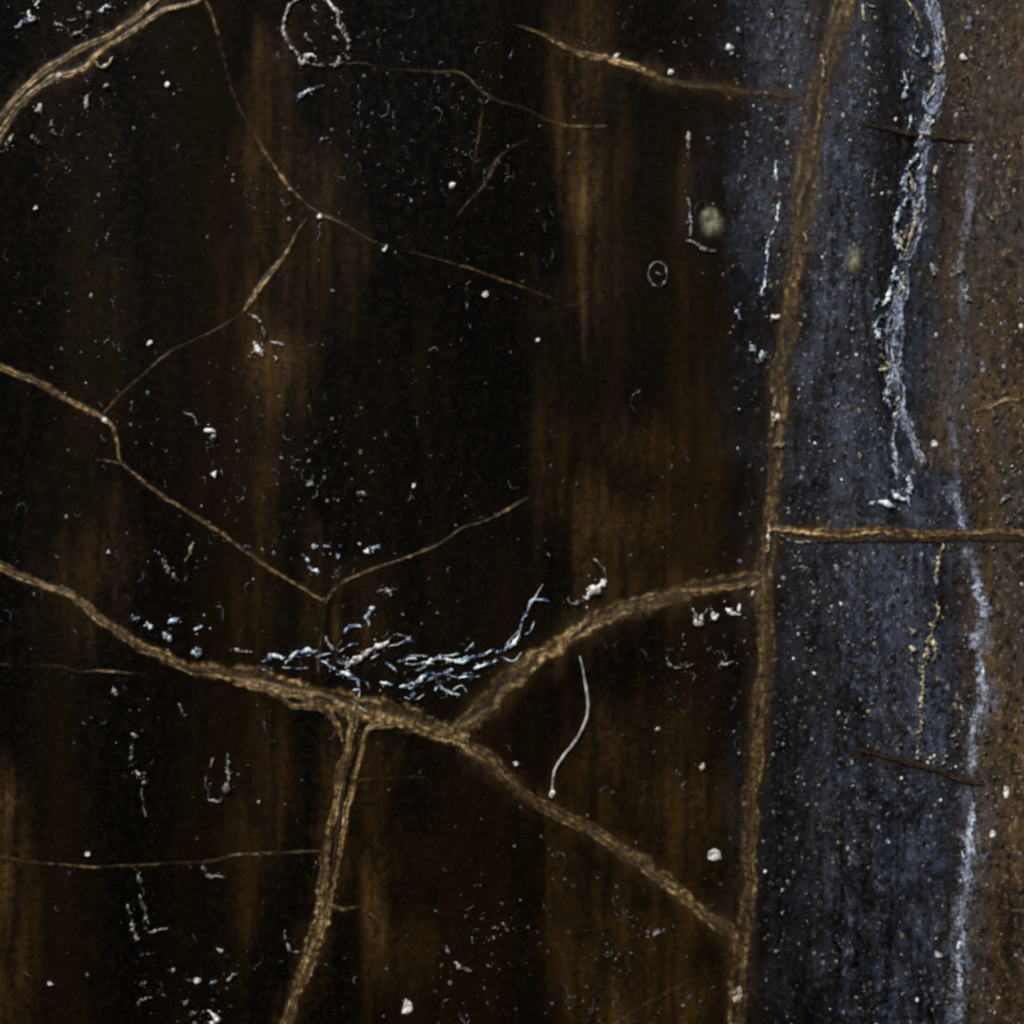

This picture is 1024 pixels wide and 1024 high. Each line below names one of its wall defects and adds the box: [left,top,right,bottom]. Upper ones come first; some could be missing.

crack [0,0,219,140]
crack [520,26,796,100]
crack [263,150,337,221]
crack [243,232,298,312]
crack [463,266,511,283]
crack [0,364,518,603]
damp [733,0,988,1024]
crack [728,0,1024,1024]
crack [0,561,763,1024]